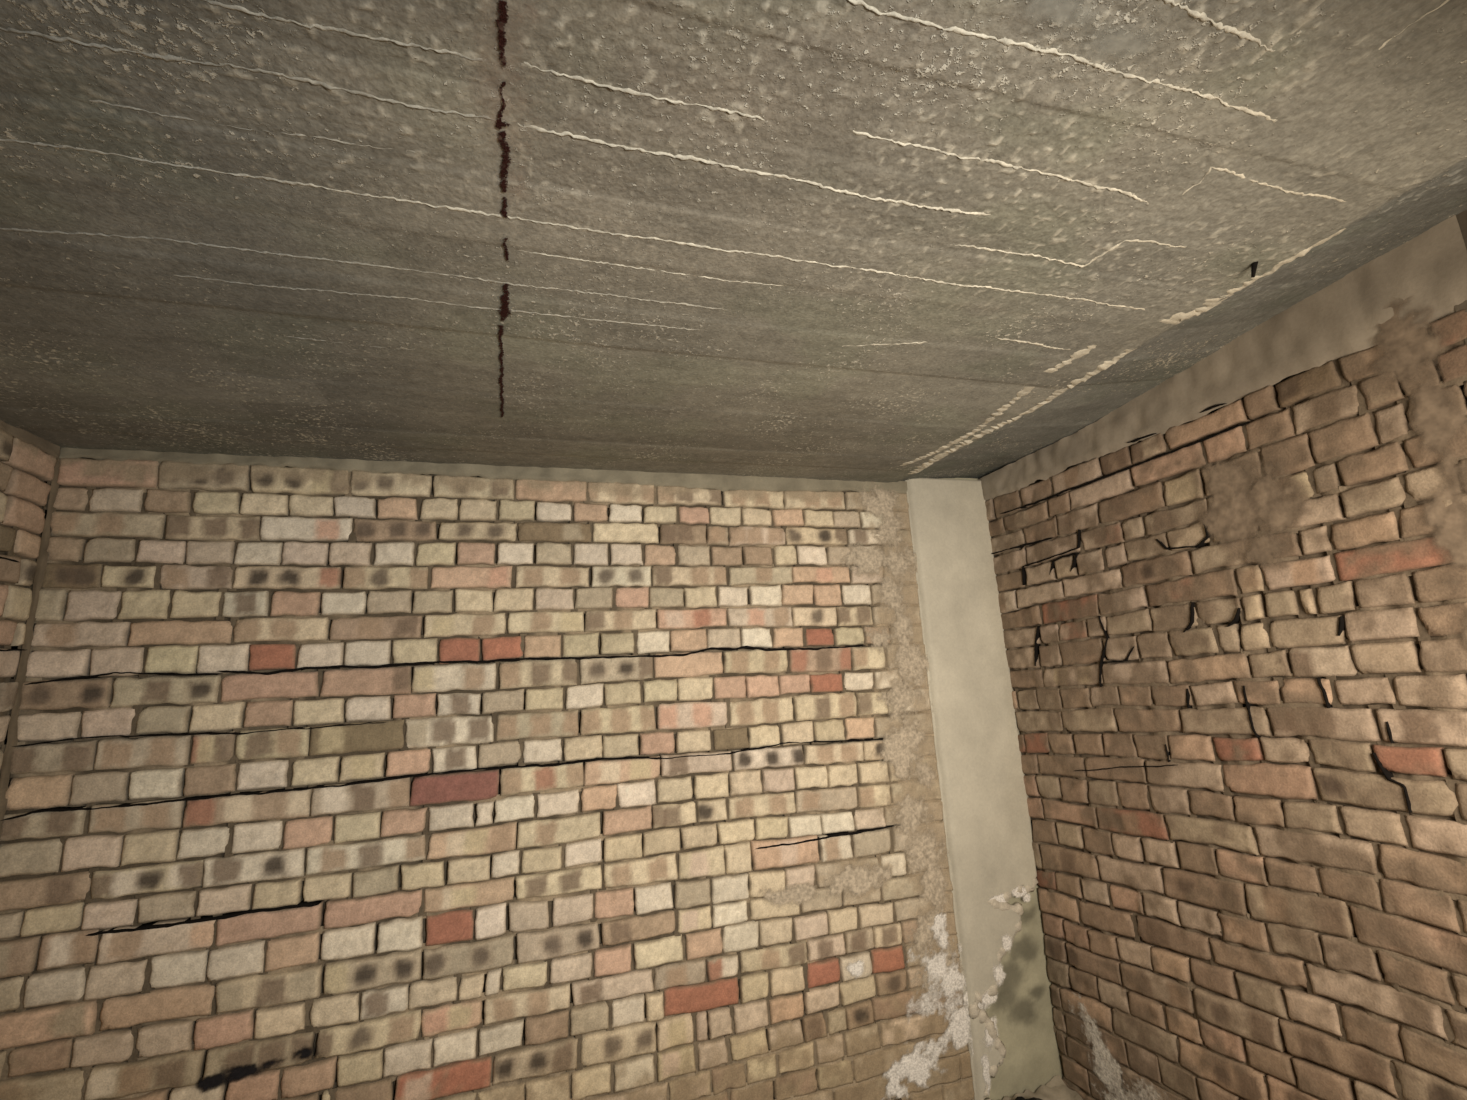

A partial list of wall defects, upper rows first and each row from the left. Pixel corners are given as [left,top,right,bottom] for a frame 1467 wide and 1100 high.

rust [496,0,511,218]
rust [498,284,513,418]
crack [991,403,1250,585]
crack [1098,616,1135,687]
crack [1184,602,1241,632]
crack [1243,686,1262,738]
crack [1316,677,1333,708]
crack [1372,721,1412,813]
crack [86,900,323,936]
leakage [847,960,864,977]
leakage [884,914,998,1098]
leakage [1079,996,1160,1100]